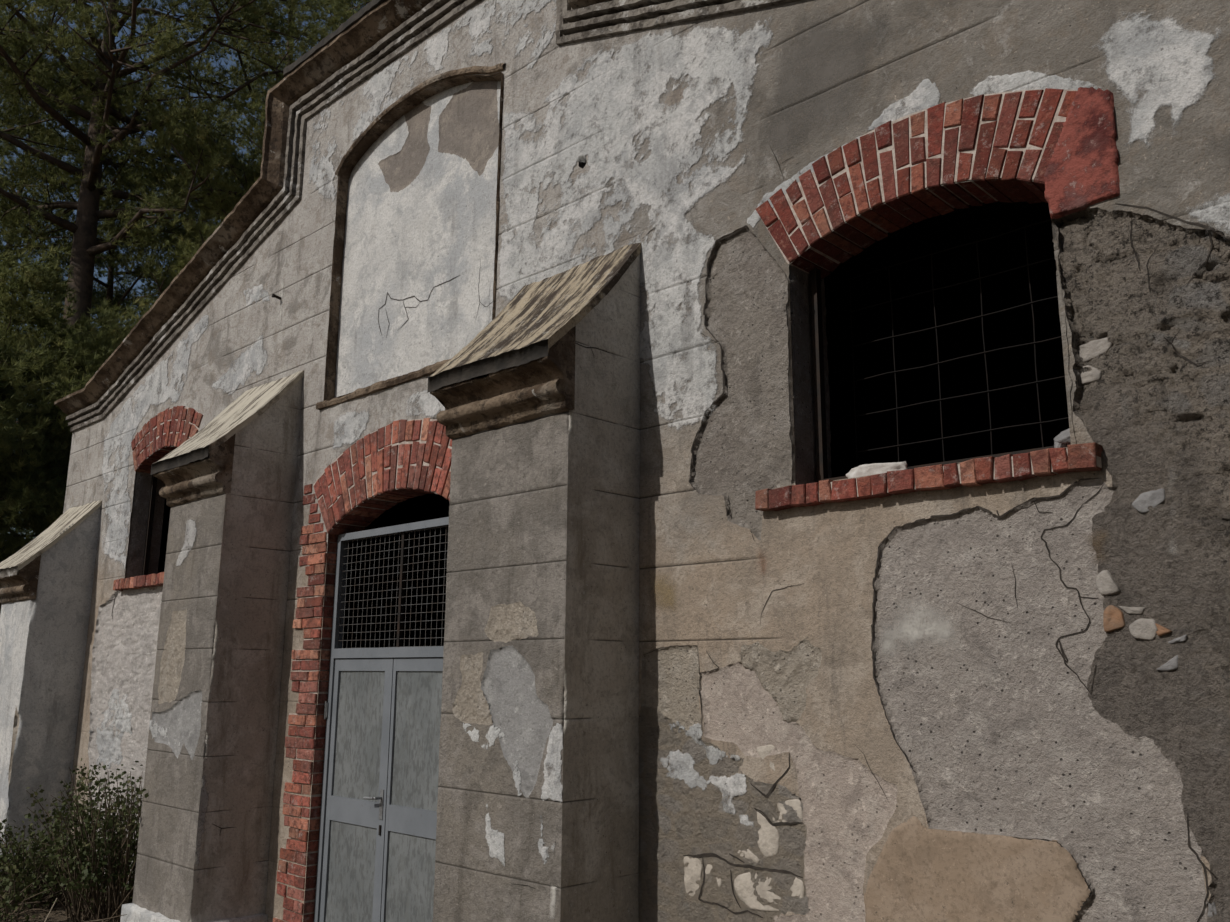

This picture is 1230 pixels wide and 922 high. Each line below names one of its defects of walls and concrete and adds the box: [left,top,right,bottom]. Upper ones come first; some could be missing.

peeling [309,0,556,201]
peeling [970,13,1219,147]
spalling [88,587,202,893]
peeling [196,769,209,879]
peeling [333,410,369,449]
crack [378,259,492,337]
peeling [453,602,563,867]
peeling [379,17,940,540]
spalling [638,639,898,922]
crack [871,478,1104,773]
spalling [872,193,1230,922]
crack [1187,815,1215,922]